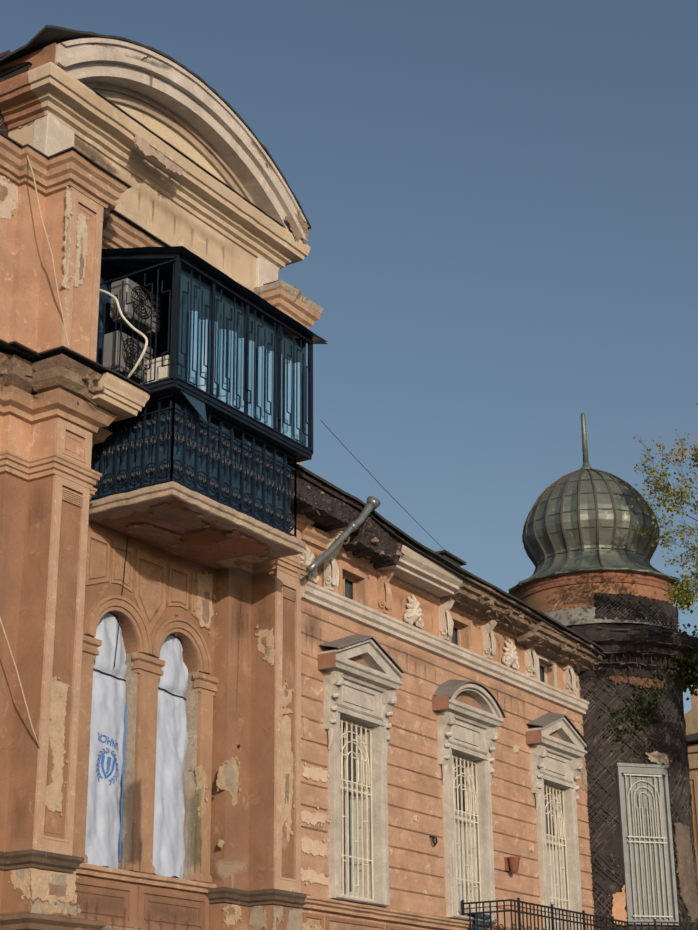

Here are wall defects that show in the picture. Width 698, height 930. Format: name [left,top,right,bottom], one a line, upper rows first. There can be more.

peeling [0,175,18,220]
peeling [60,186,89,289]
peeling [195,571,217,634]
peeling [255,624,276,665]
peeling [45,676,69,816]
peeling [193,756,242,819]
peeling [276,678,331,858]
peeling [8,868,81,916]
peeling [221,904,323,930]
peeling [301,867,330,893]